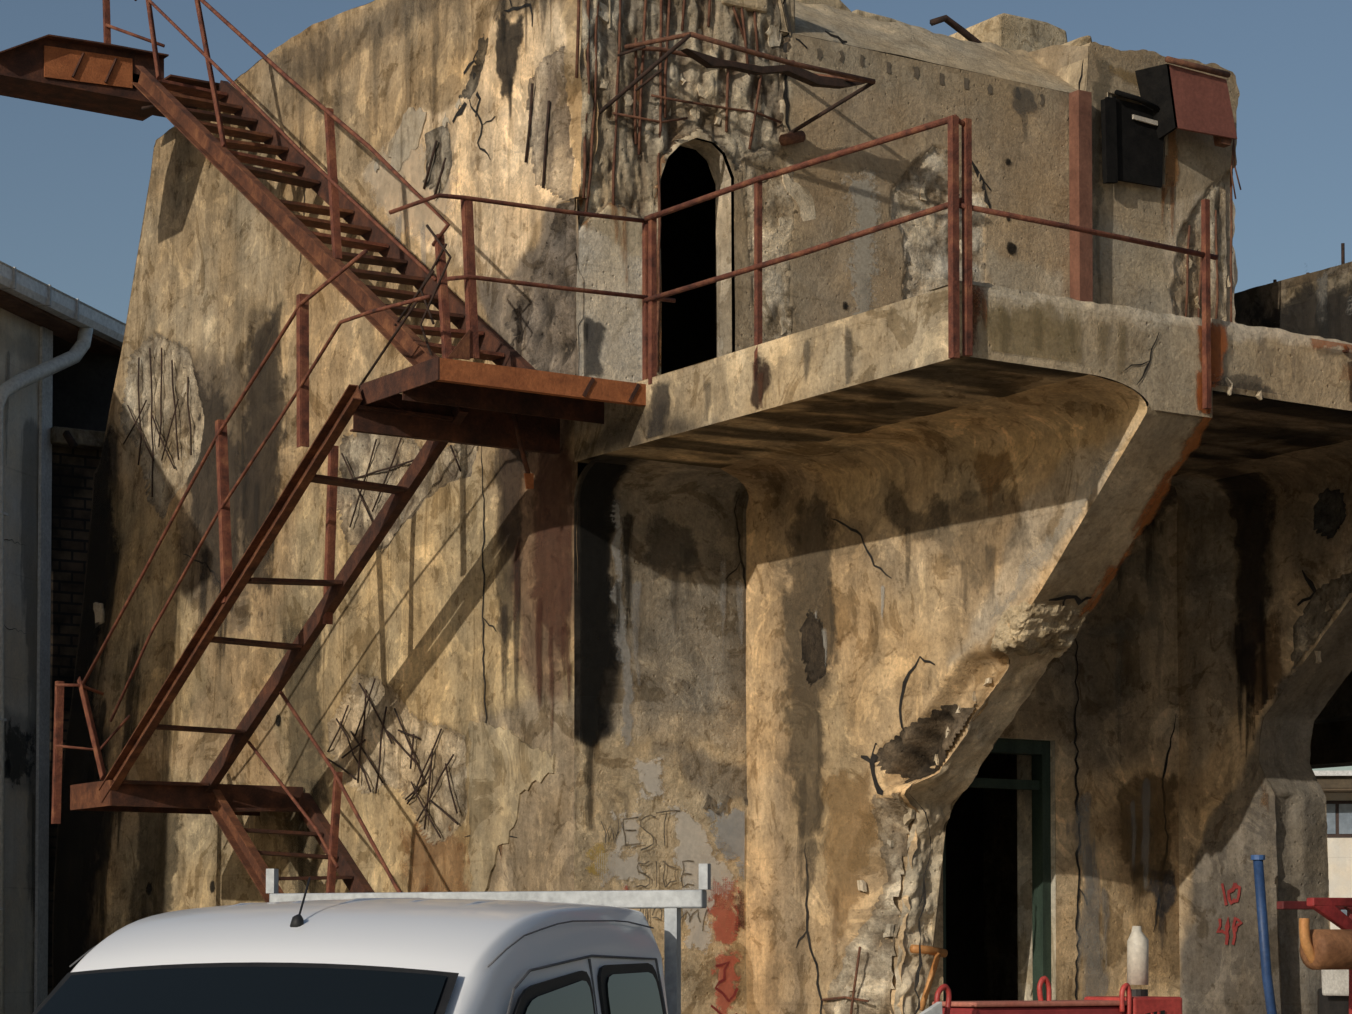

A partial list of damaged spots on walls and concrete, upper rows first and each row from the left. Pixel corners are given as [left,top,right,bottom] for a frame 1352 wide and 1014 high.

water stain [495,13,523,116]
spalling [505,0,816,375]
spalling [120,333,204,519]
spalling [327,673,556,892]
water stain [580,462,700,825]
water stain [782,495,837,890]
spalling [822,678,992,1014]
crack [1049,595,1092,606]
crack [1074,638,1085,1000]
corrosion [1080,322,1228,616]
water stain [1215,472,1276,743]
corrosion [1311,338,1352,402]